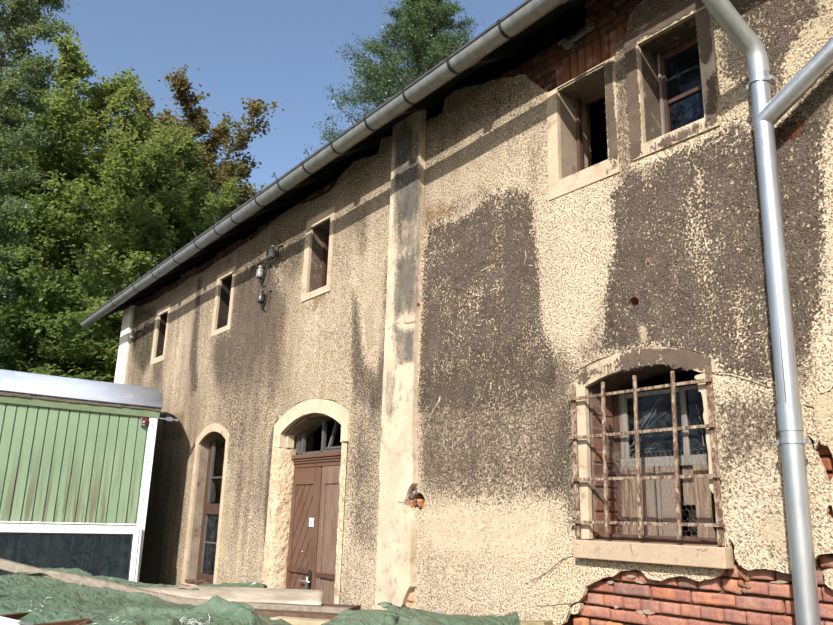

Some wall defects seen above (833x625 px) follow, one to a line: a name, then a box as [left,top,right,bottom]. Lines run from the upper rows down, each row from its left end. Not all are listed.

spalling [496,0,719,173]
damp [729,0,832,99]
peeling [783,0,833,76]
spalling [135,210,288,307]
damp [346,0,780,552]
damp [774,67,833,392]
peeling [811,389,833,481]
peeling [408,488,558,570]
spalling [590,533,718,547]
spalling [570,541,796,625]
spalling [815,553,833,625]